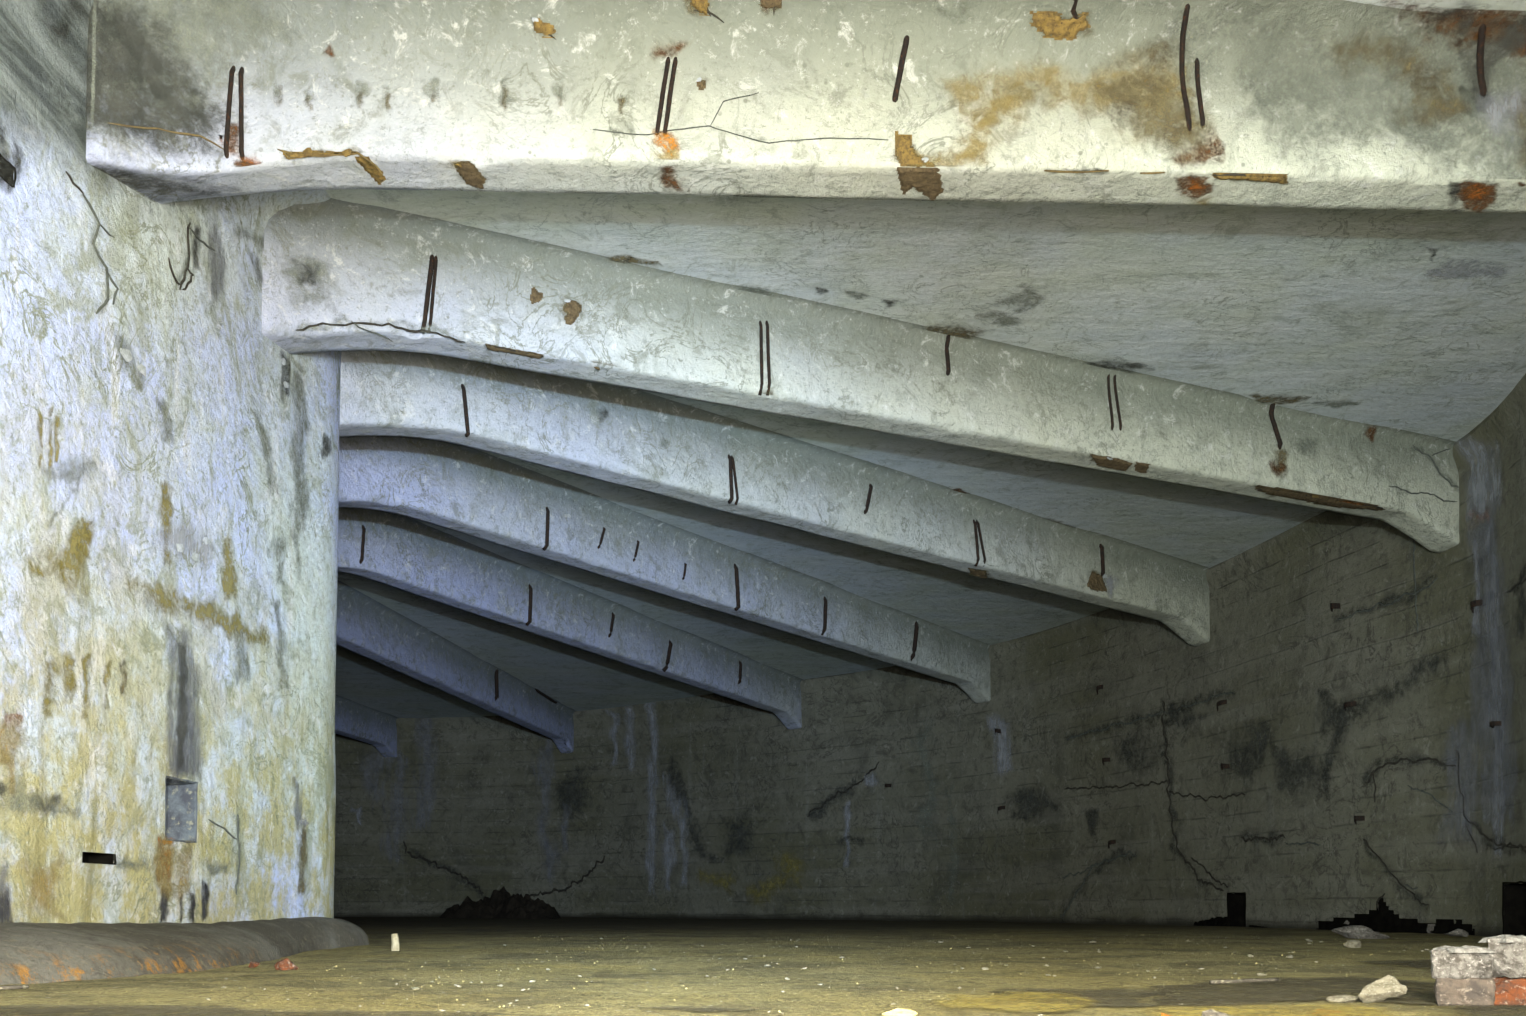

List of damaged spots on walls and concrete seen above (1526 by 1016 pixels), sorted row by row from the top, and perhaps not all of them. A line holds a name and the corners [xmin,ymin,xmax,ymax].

crack [65,171,119,314]
water stain [53,0,281,152]
crack [593,92,888,144]
spalling [894,131,944,201]
corrosion [951,16,1225,204]
corrosion [1450,181,1497,212]
water stain [161,482,173,561]
water stain [276,373,308,580]
water stain [128,540,287,774]
crack [1060,692,1245,917]
crack [1363,750,1526,855]
spalling [1317,893,1475,936]